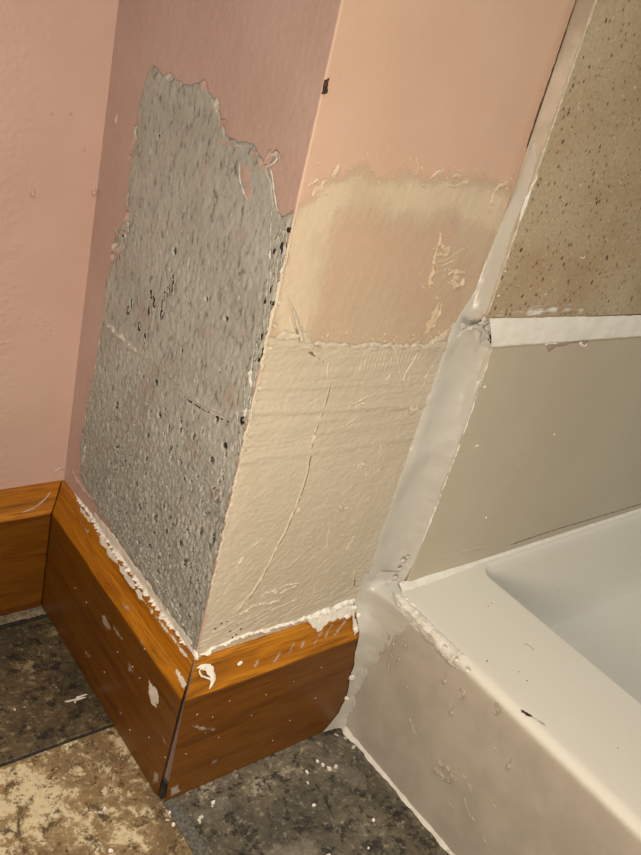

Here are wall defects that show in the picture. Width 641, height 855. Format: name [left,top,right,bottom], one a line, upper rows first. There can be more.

crack [105,322,231,423]
peeling [80,66,297,649]
crack [233,386,331,614]